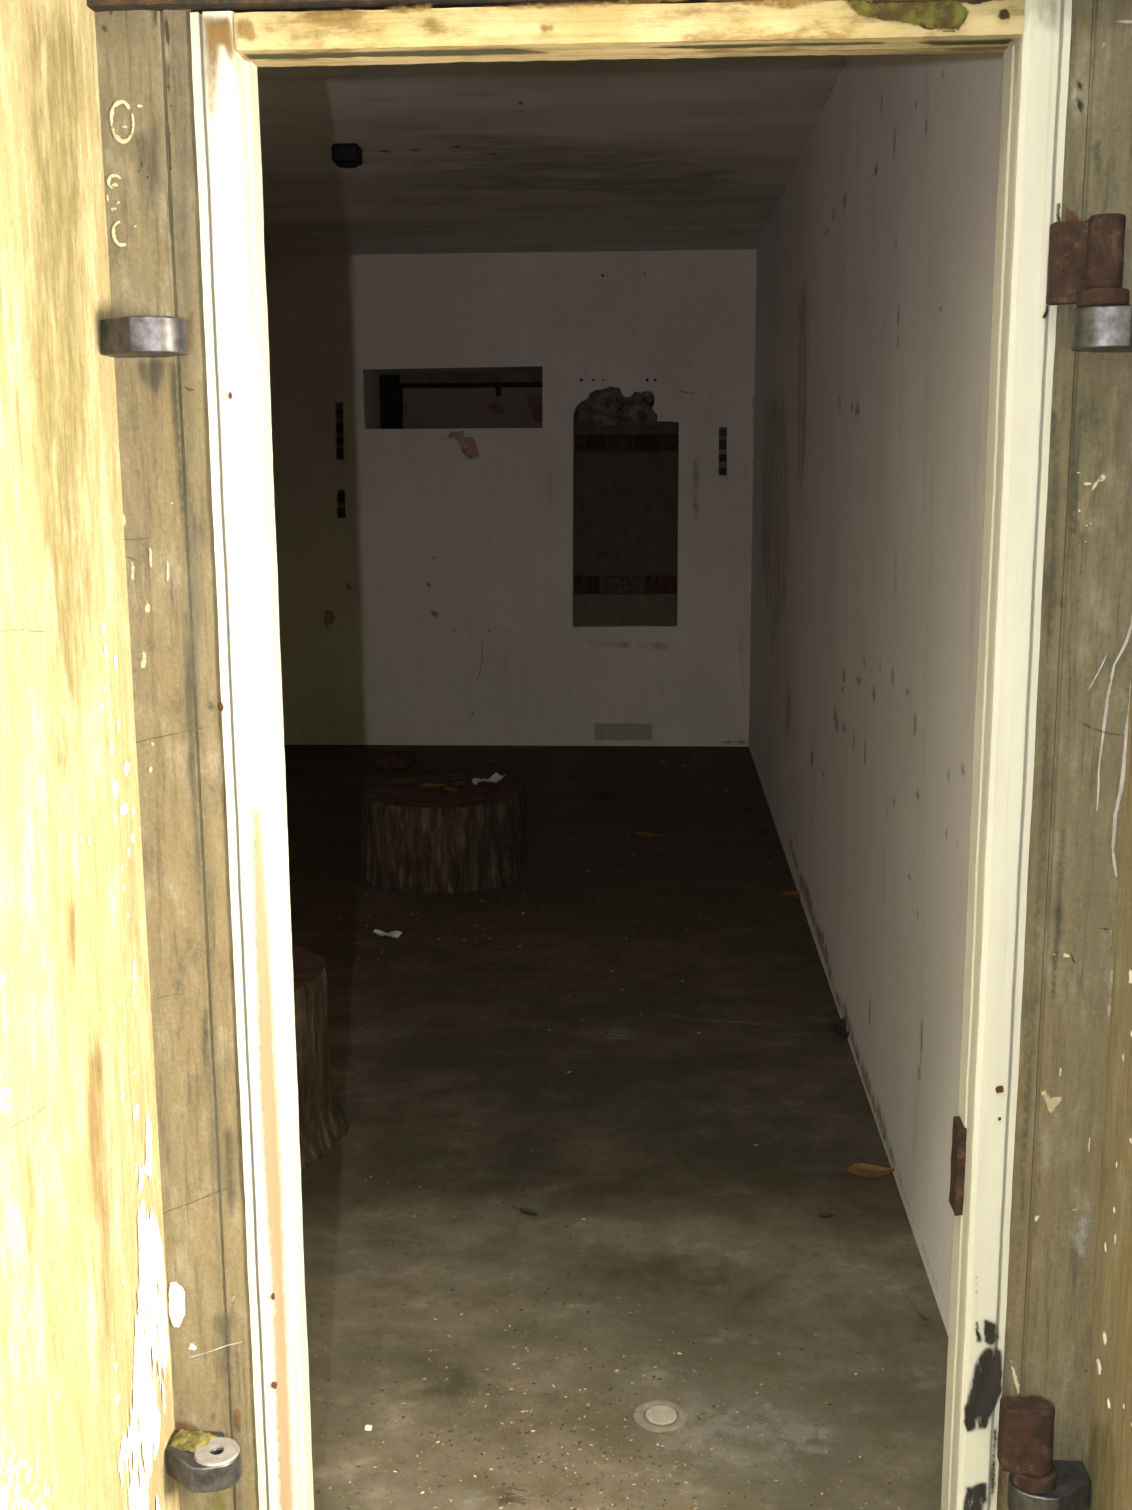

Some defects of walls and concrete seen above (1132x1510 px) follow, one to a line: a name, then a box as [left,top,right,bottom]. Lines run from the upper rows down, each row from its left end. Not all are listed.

peeling [0,1088,13,1115]
peeling [114,1090,185,1510]
peeling [0,1431,54,1510]